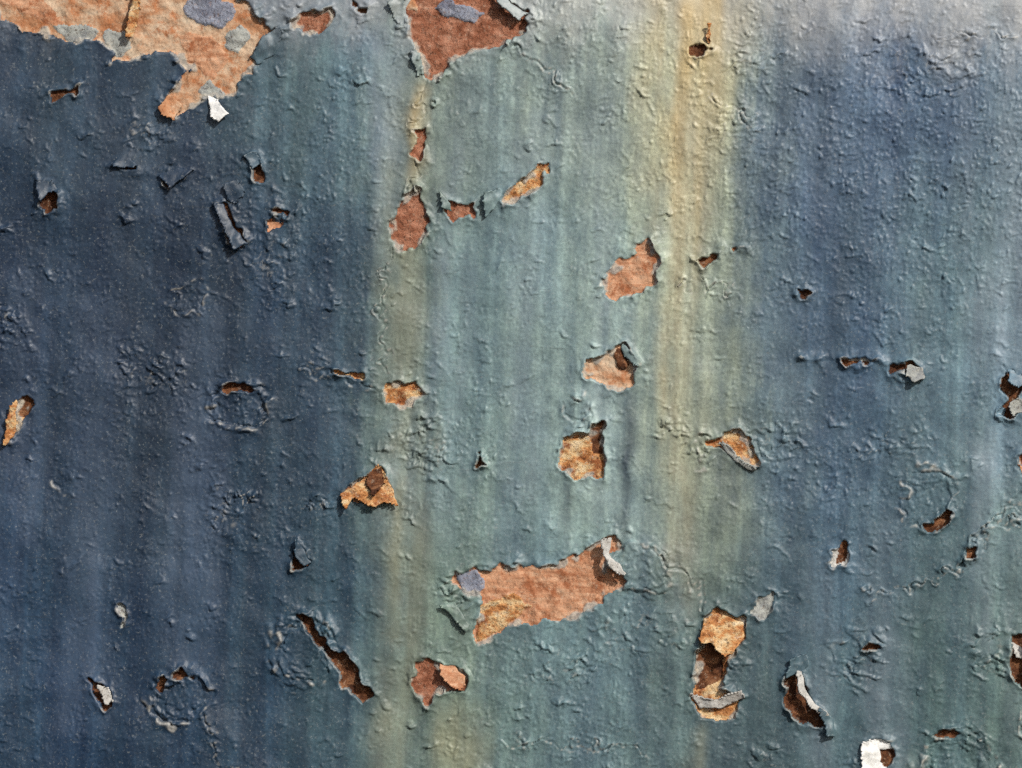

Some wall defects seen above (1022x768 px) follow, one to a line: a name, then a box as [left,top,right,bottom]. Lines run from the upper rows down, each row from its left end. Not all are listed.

peeling [0,0,545,131]
peeling [379,121,557,261]
peeling [585,230,670,309]
peeling [574,337,651,401]
peeling [333,459,401,513]
peeling [549,415,612,487]
peeling [436,525,638,655]
peeling [286,605,380,713]
peeling [405,652,476,719]
peeling [683,585,780,730]
peeling [777,653,843,737]
peeling [854,729,902,768]